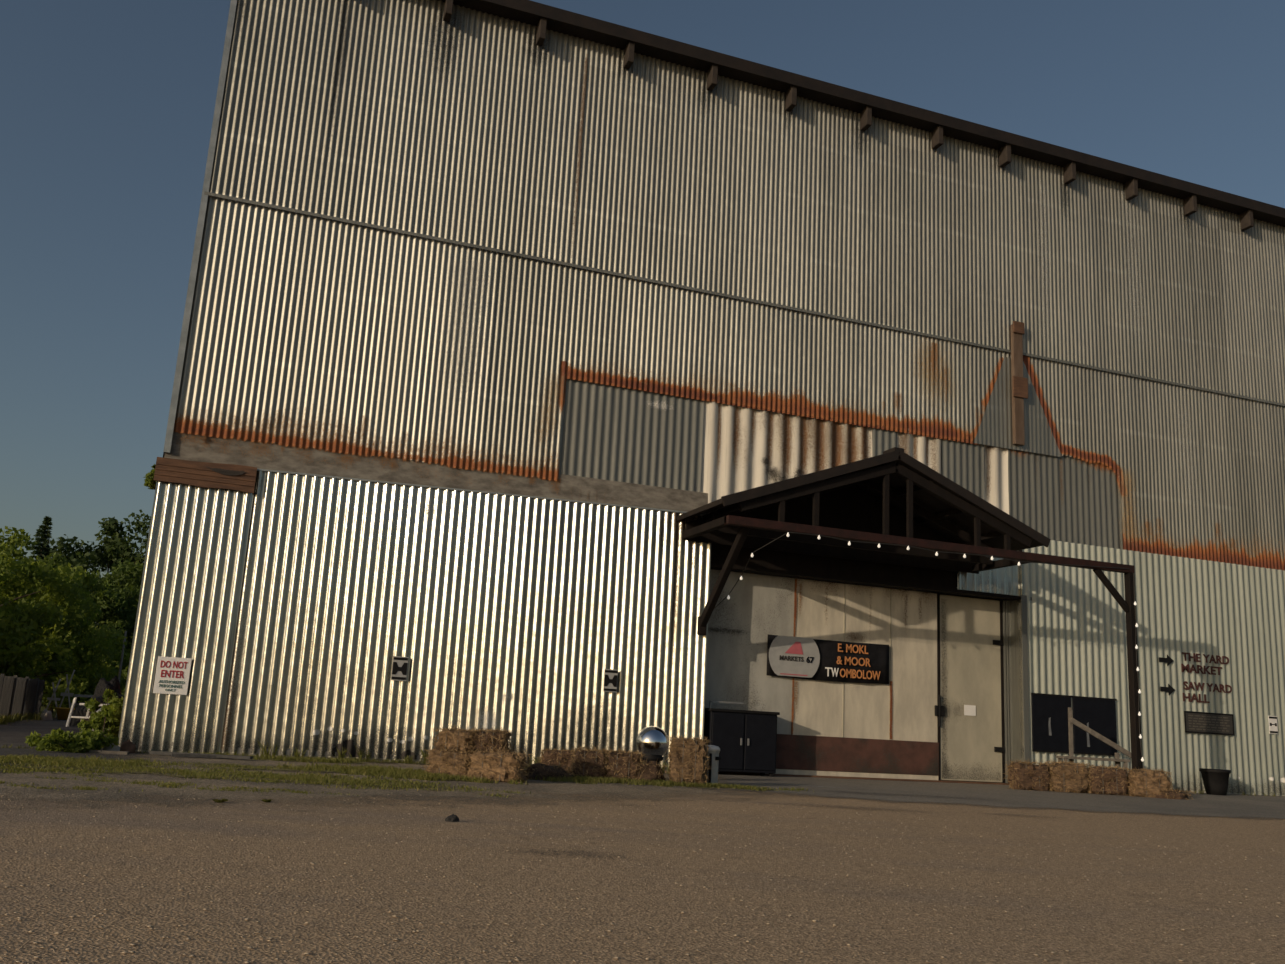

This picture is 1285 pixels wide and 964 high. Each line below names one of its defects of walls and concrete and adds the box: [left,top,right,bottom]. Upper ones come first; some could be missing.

corrosion [173,338,1040,498]
corrosion [1023,355,1285,571]